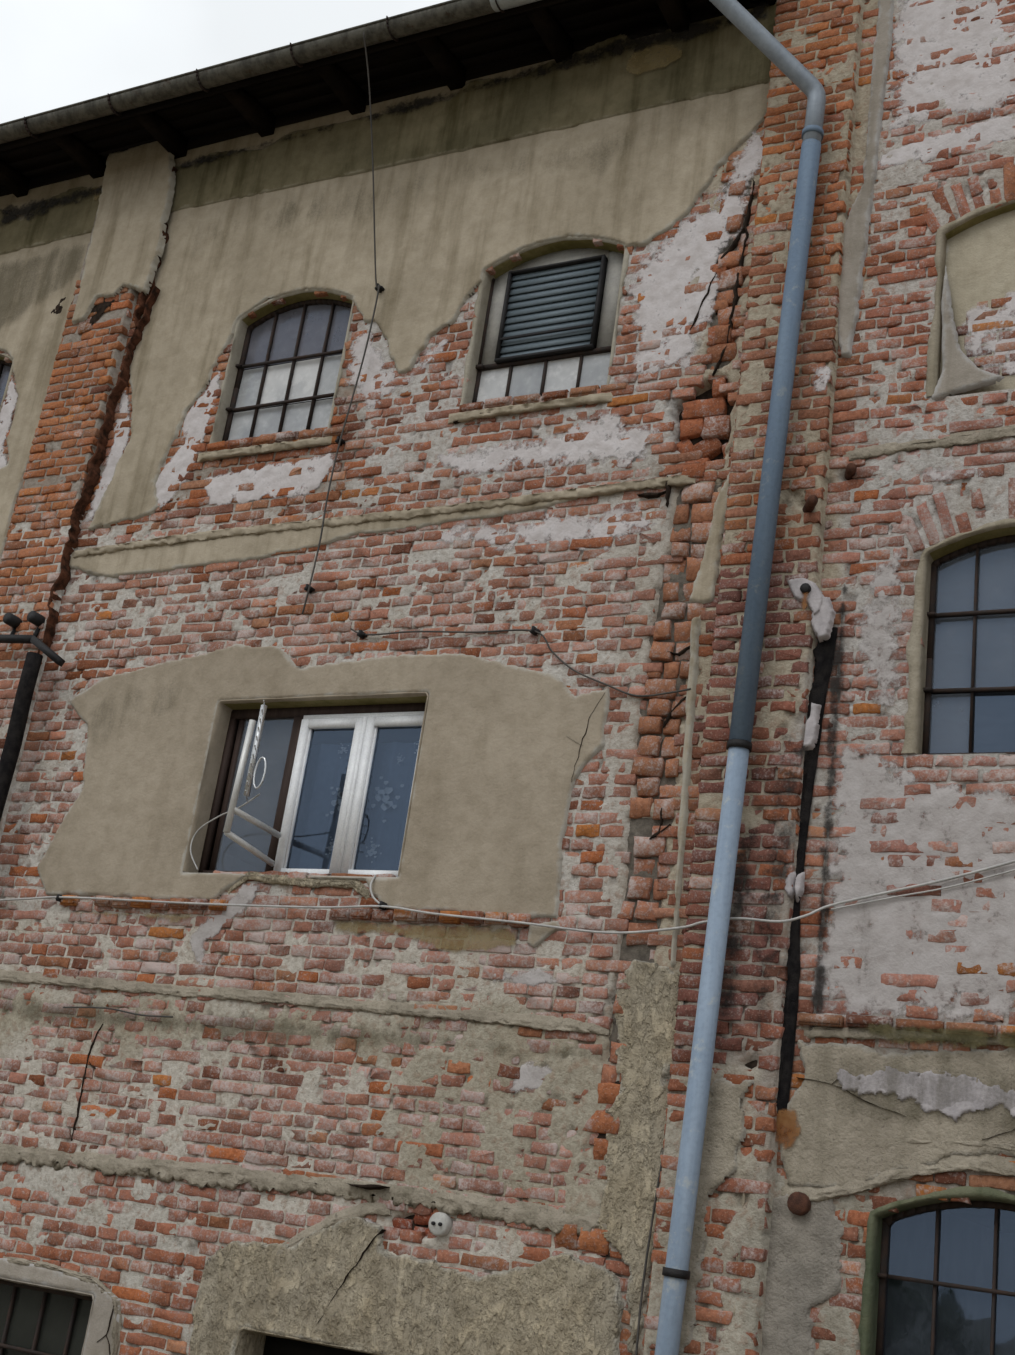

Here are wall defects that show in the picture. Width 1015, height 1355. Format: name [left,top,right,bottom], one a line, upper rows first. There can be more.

flaking render [174,59,554,166]
flaking render [838,0,894,358]
crack [690,180,755,376]
spalling [931,265,1015,401]
crack [37,222,169,653]
flaking render [37,83,769,1355]
peeling [785,872,805,902]
crack [796,1077,904,1116]
crack [347,1182,390,1190]
flaking render [761,1040,1015,1355]
crack [318,1229,386,1322]